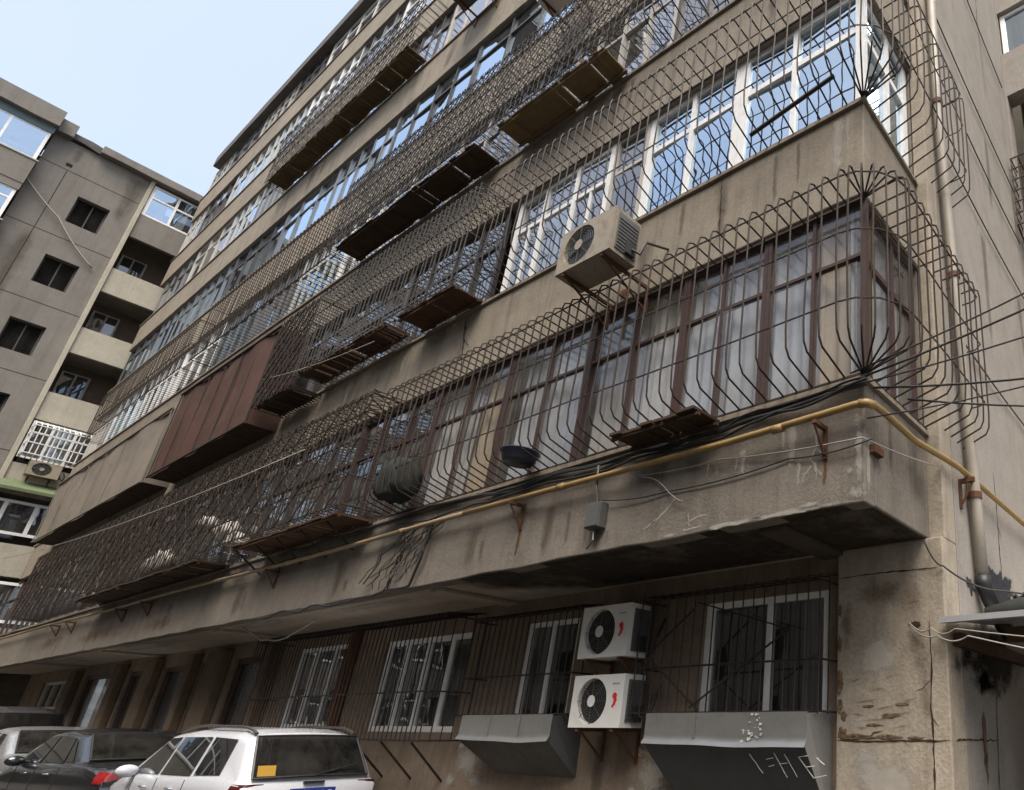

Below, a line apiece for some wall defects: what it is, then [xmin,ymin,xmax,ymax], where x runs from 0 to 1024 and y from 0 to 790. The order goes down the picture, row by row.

damp [833,118,849,169]
spalling [837,670,926,740]
crack [837,623,1000,790]